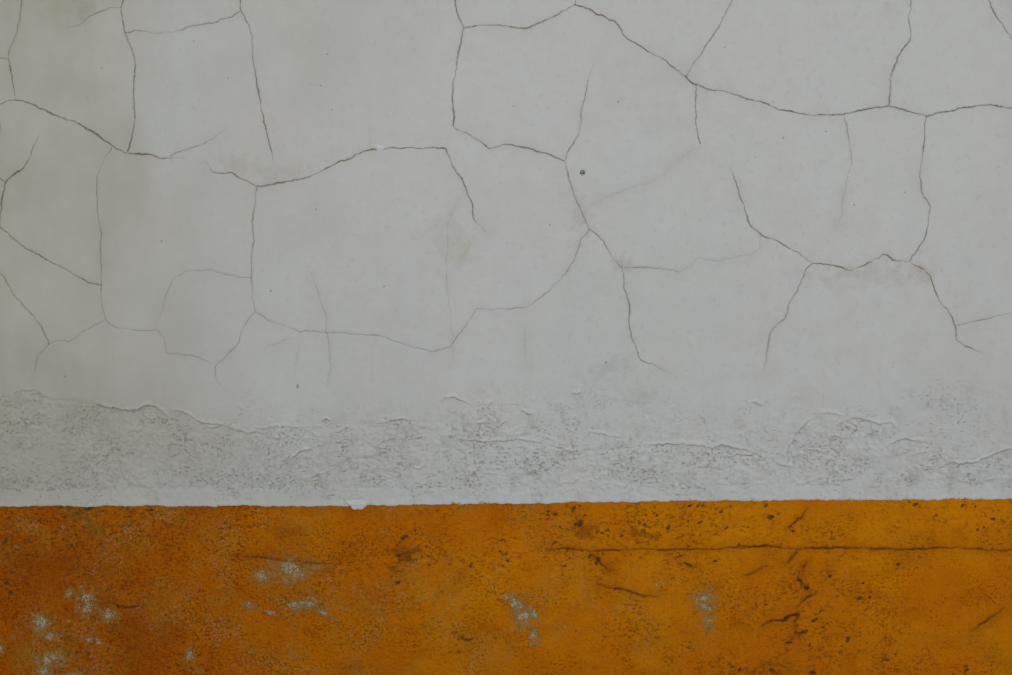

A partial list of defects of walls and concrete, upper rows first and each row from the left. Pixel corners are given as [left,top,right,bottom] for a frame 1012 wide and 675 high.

crack [2,65,165,159]
crack [734,179,972,349]
crack [769,596,809,622]